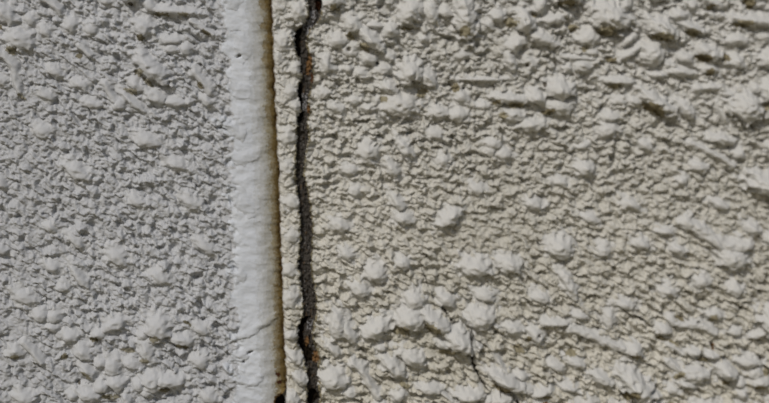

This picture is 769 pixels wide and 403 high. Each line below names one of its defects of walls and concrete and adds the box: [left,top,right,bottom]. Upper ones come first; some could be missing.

crack [294,0,322,403]
crack [441,306,519,403]